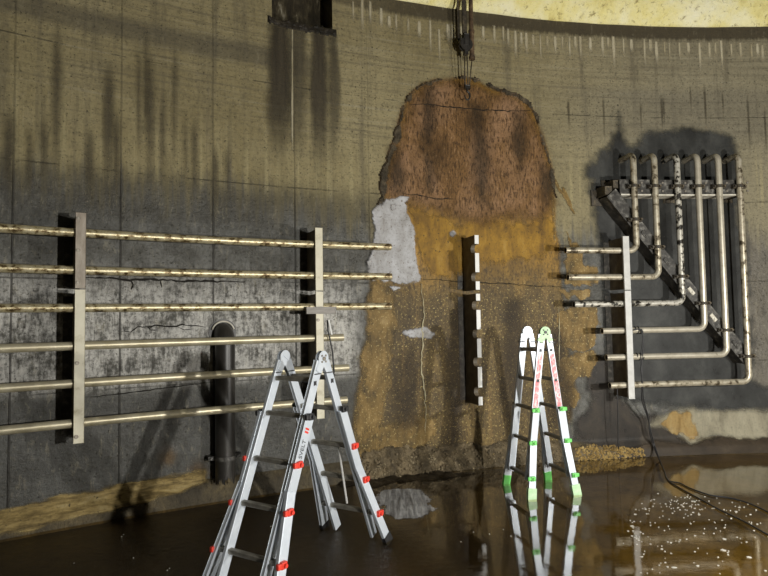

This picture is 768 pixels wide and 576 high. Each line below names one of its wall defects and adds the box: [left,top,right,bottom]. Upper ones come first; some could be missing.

crack [124,324,203,332]
crack [86,277,242,290]
water stain [269,25,340,140]
peeling [367,78,443,291]
peeling [403,327,434,339]
crack [412,104,530,112]
rust [353,78,599,457]
crack [421,279,570,426]
spalling [455,75,575,240]
water stain [482,26,633,60]
water stain [586,128,753,345]
water stain [575,206,768,458]